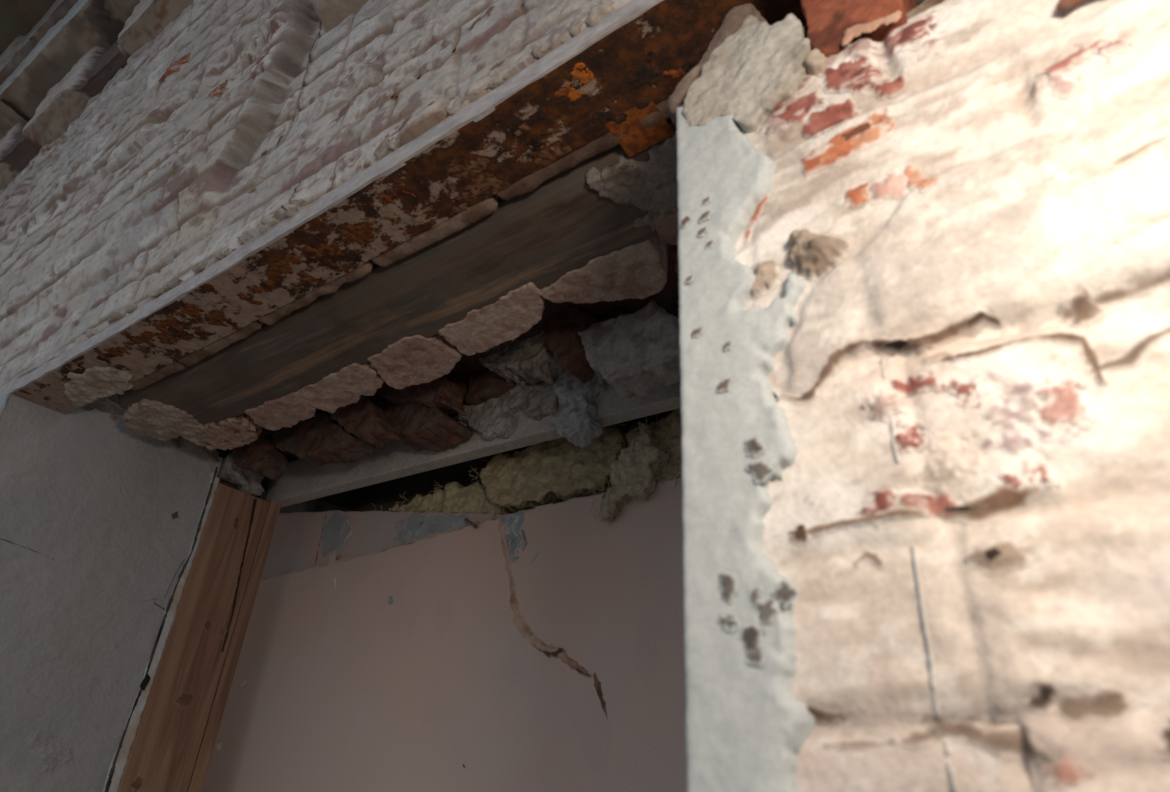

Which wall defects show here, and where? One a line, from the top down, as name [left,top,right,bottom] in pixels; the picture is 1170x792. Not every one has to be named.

corrosion [554,63,594,101]
corrosion [586,15,726,157]
peeling [756,8,947,177]
corrosion [446,155,510,216]
spalling [844,162,945,209]
corrosion [236,188,419,305]
corrosion [95,304,229,364]
spalling [744,435,776,484]
peeling [855,367,1100,528]
crack [498,515,608,720]
spalling [718,571,800,667]
spalling [1053,685,1151,727]